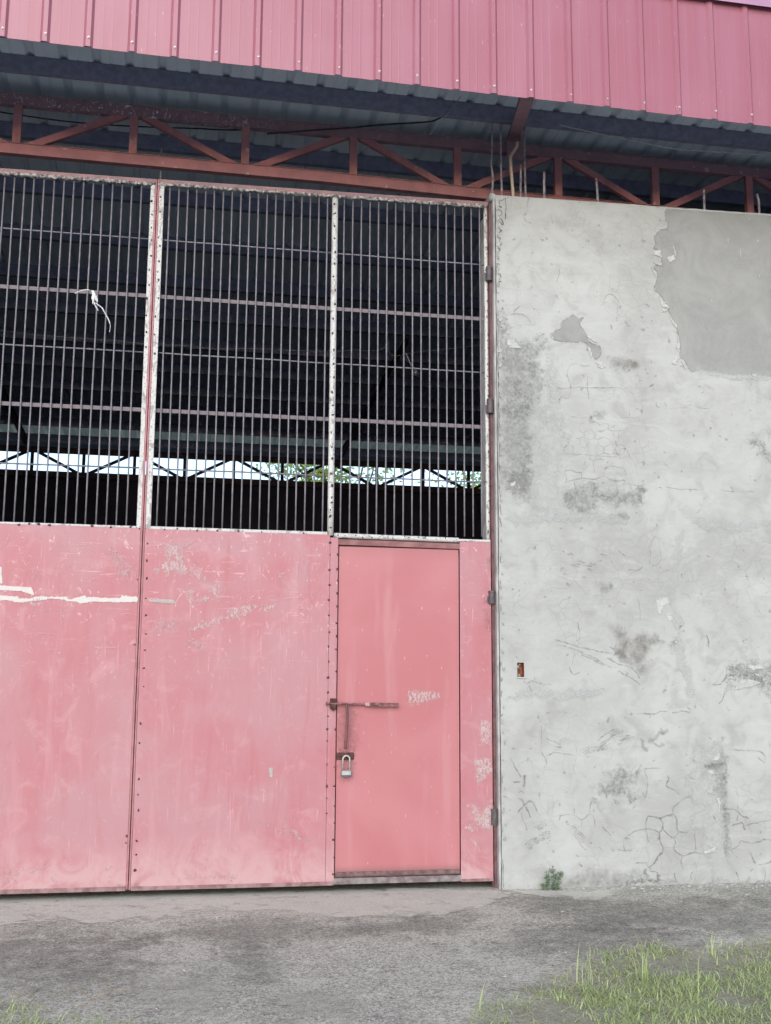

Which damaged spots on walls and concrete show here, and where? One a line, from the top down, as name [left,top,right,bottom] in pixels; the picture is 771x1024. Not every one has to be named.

flaking render [490,123,506,526]
flaking render [536,314,606,369]
flaking render [651,189,771,380]
peeling [0,567,176,605]
peeling [465,758,507,846]